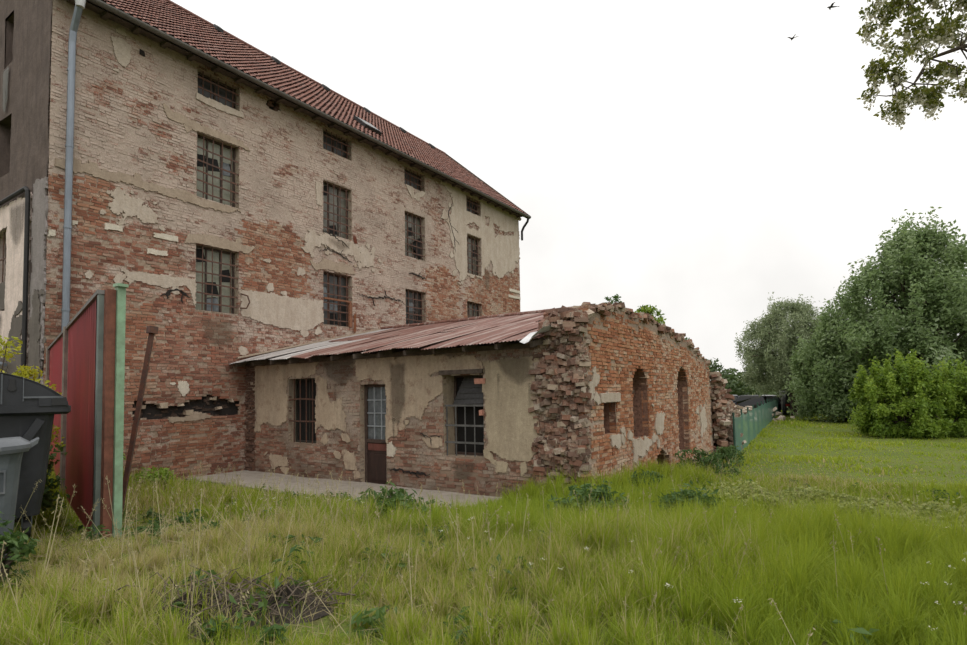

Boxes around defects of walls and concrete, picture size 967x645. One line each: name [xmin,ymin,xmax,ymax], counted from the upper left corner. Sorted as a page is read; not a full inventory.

flaking render [47,172,166,235]
crack [161,288,190,303]
flaking render [423,251,520,322]
flaking render [581,366,601,405]
flaking render [483,448,528,476]